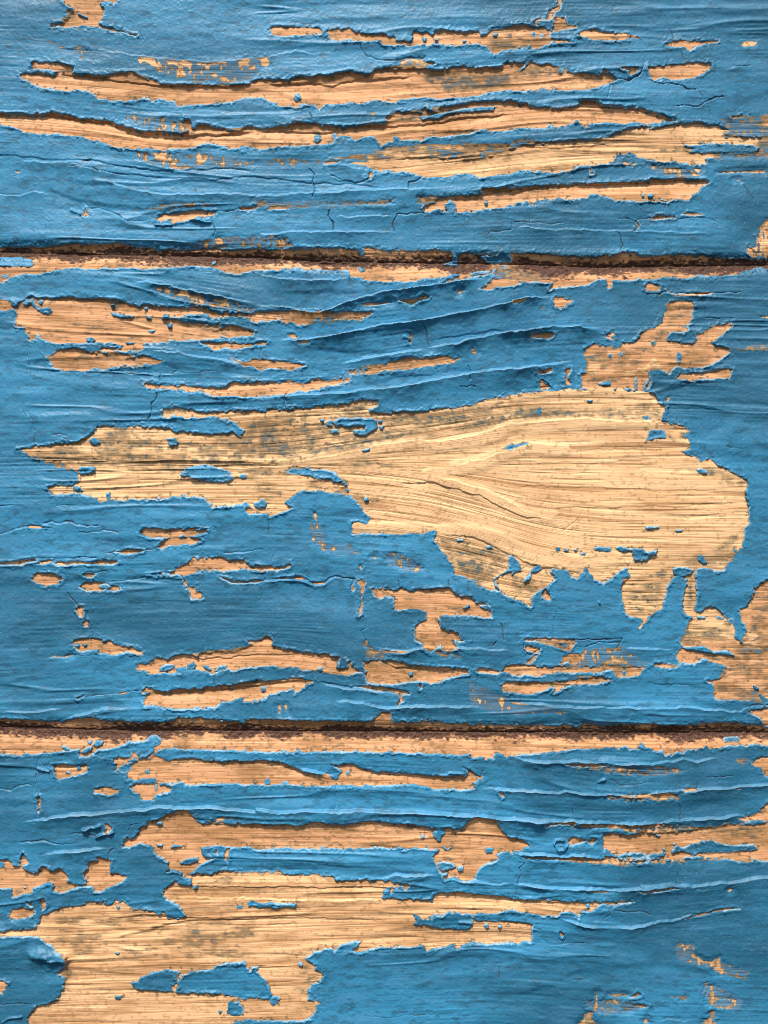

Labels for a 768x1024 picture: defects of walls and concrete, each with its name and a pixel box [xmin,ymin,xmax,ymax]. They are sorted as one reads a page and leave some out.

peeling [131,202,216,224]
peeling [0,0,768,220]
peeling [0,219,768,802]
peeling [0,803,768,1024]